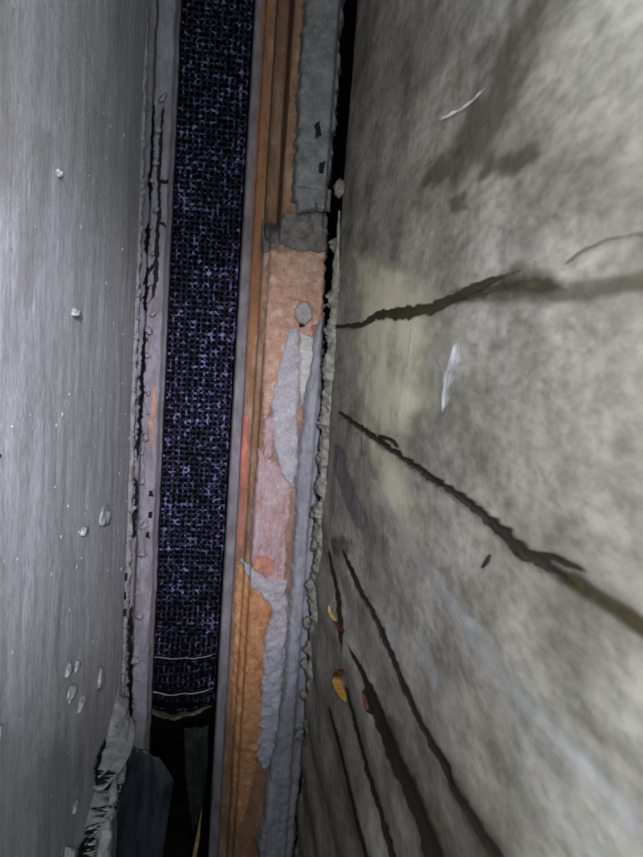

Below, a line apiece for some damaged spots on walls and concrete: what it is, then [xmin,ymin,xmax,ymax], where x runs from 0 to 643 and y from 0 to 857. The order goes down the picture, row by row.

crack [132,105,168,539]
crack [335,267,643,329]
crack [567,233,643,263]
crack [339,412,643,637]
crack [126,606,134,718]
crack [328,550,501,857]
peeling [64,846,77,857]